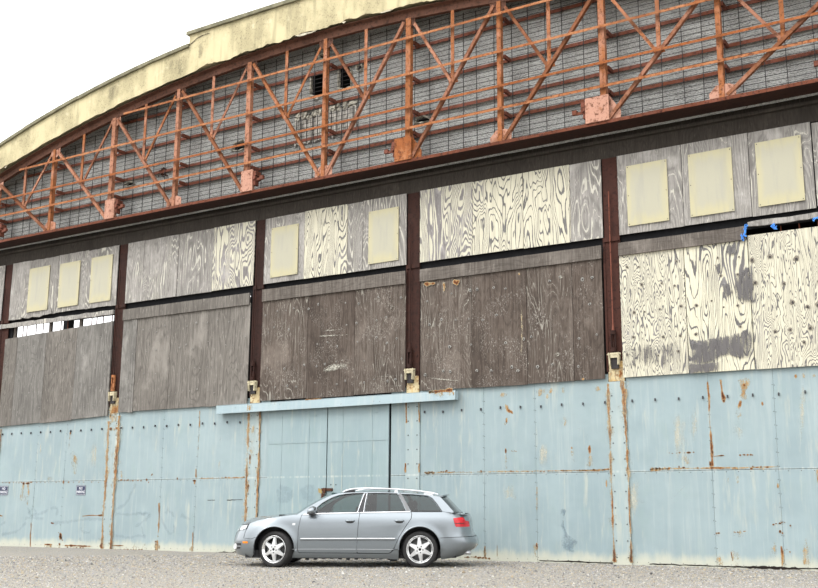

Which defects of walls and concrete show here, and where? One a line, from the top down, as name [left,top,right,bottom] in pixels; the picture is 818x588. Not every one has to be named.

rust [44,404,153,550]
rust [193,405,262,522]
rust [418,368,633,563]
rust [650,380,773,472]